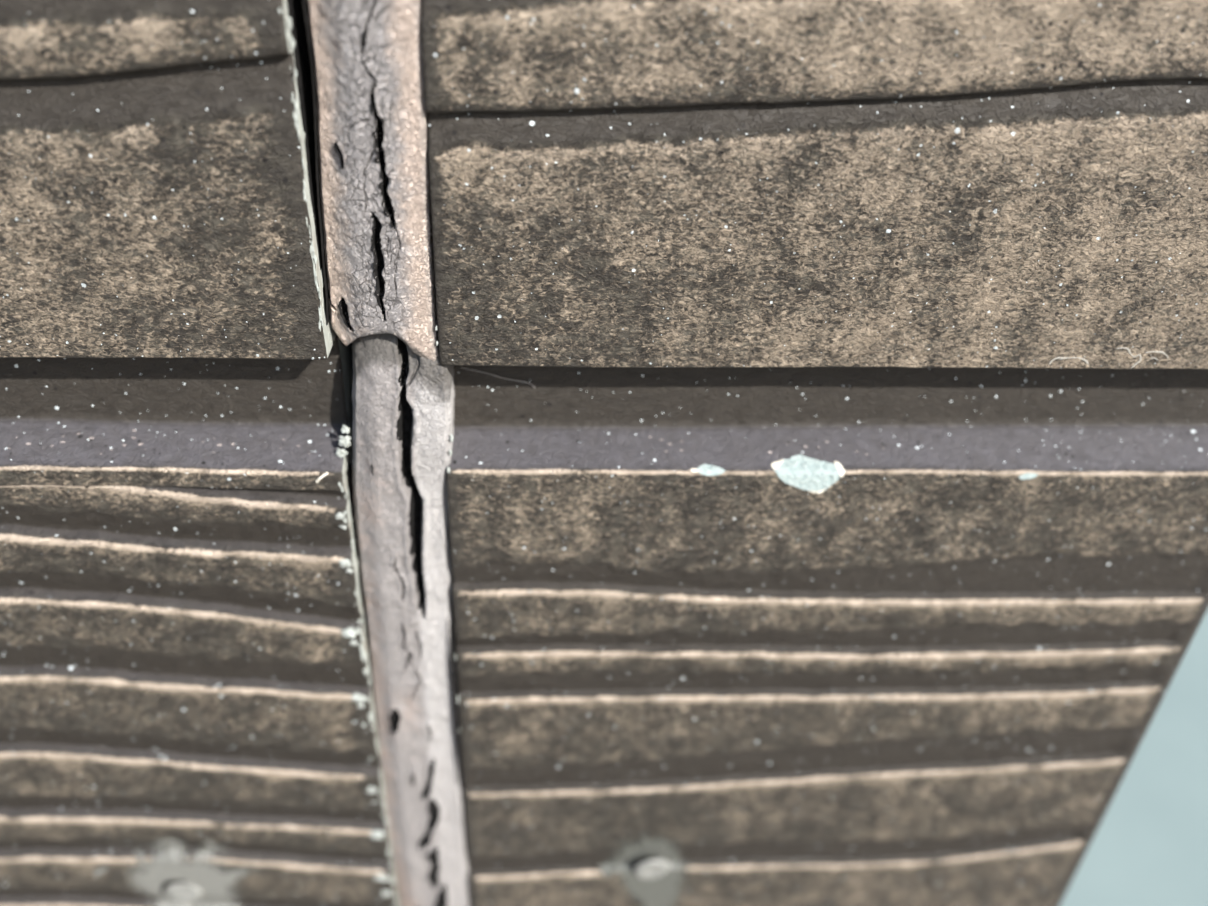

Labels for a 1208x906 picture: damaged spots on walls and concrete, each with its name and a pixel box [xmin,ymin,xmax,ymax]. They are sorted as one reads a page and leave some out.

crack [329,0,448,906]
peeling [769,441,845,494]